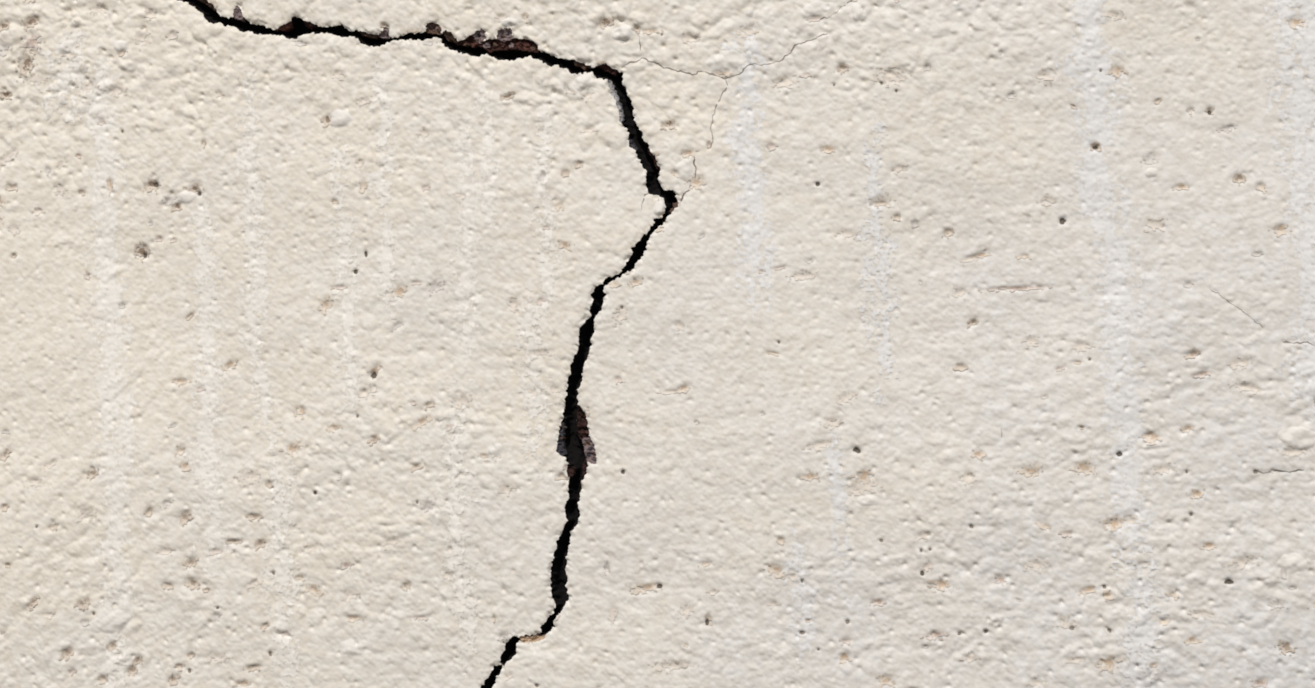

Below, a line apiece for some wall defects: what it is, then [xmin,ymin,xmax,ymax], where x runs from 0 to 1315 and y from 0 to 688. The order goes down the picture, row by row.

crack [177,0,852,688]